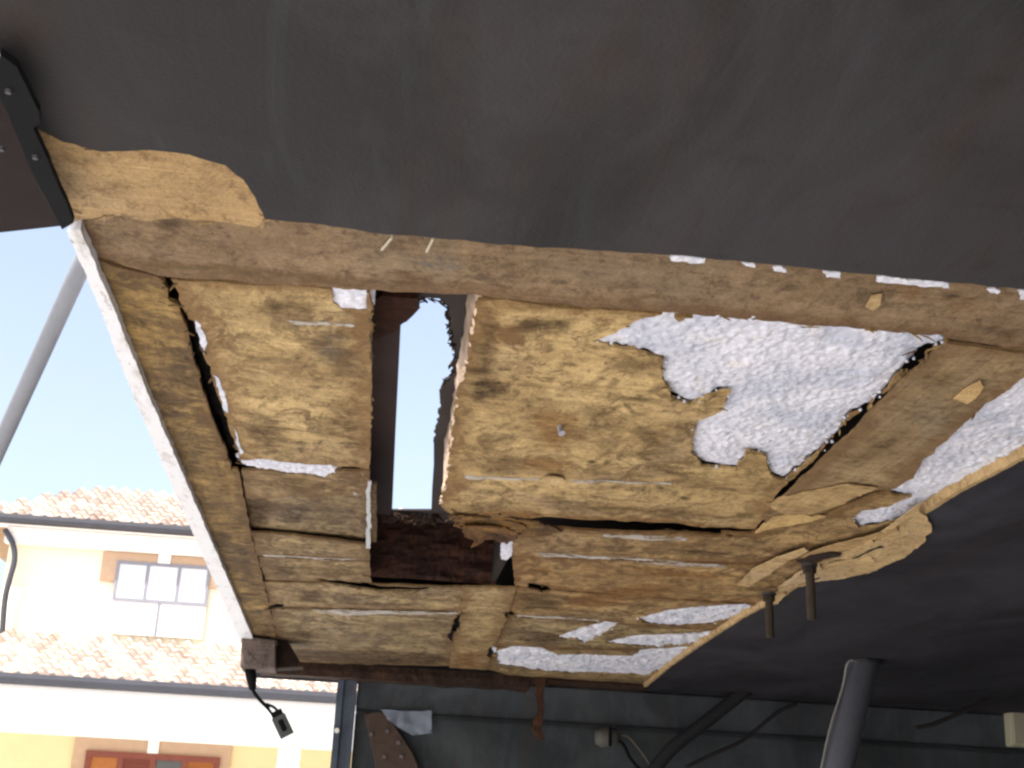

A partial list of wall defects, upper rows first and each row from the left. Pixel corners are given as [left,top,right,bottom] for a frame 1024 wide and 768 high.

crack [161,277,246,465]
crack [902,350,928,369]
peeling [953,380,984,404]
spalling [491,540,508,581]